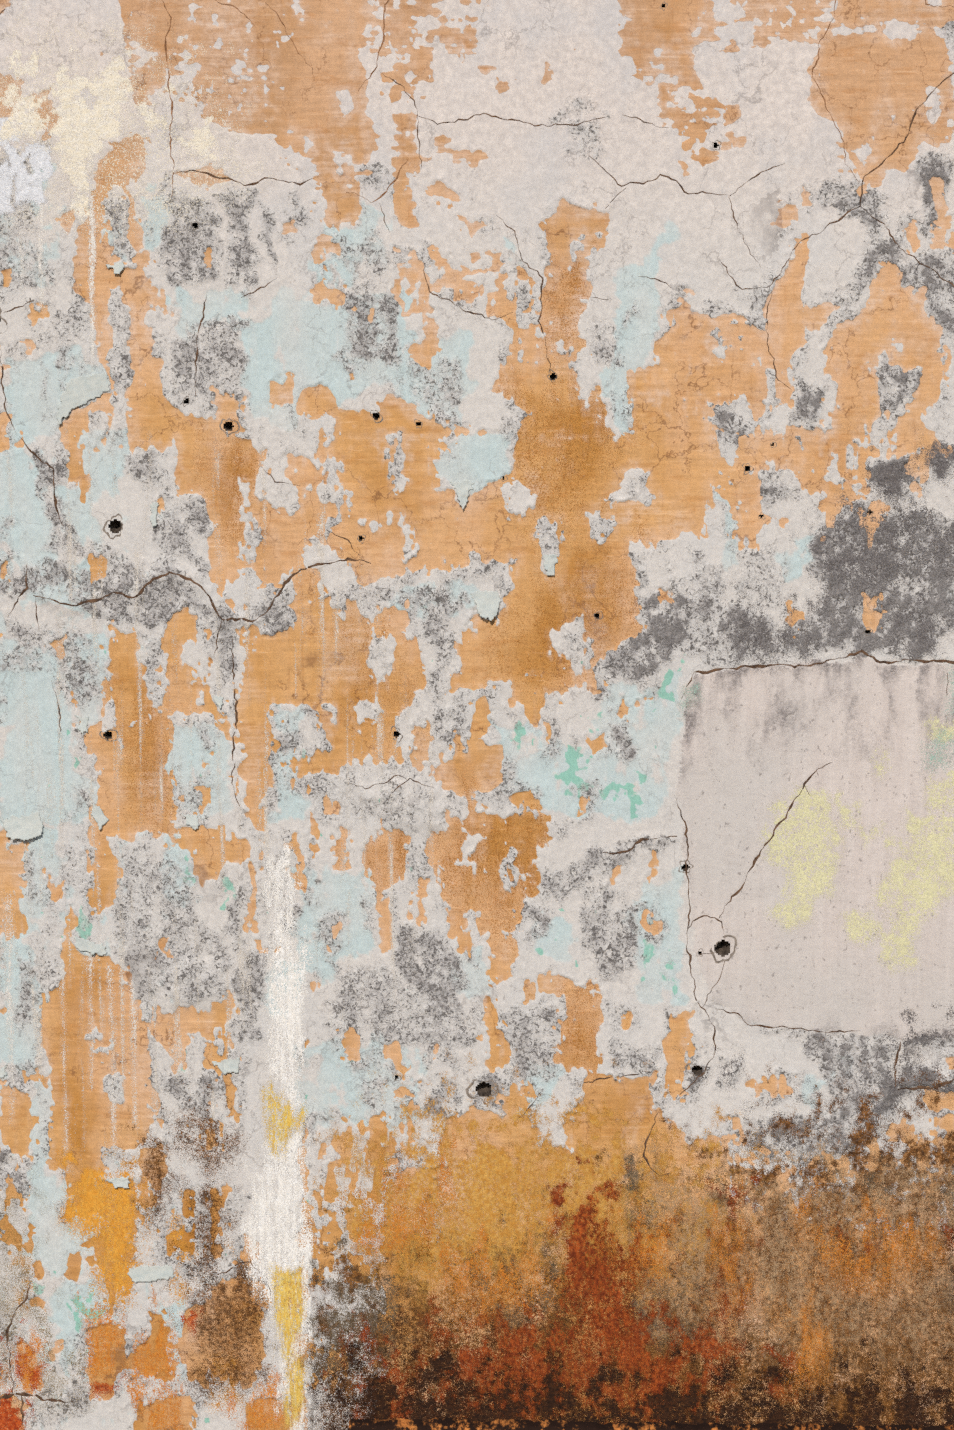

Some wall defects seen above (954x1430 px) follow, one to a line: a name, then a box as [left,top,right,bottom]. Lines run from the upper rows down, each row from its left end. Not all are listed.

peeling [0,0,380,313]
crack [163,2,313,197]
crack [422,217,551,367]
crack [347,0,669,232]
peeling [459,0,716,129]
crack [591,0,954,387]
peeling [57,134,953,1074]
damp [0,418,954,1430]
crack [584,762,859,1176]
peeling [0,906,301,1430]
peeling [315,971,698,1424]
rust [313,1053,954,1425]